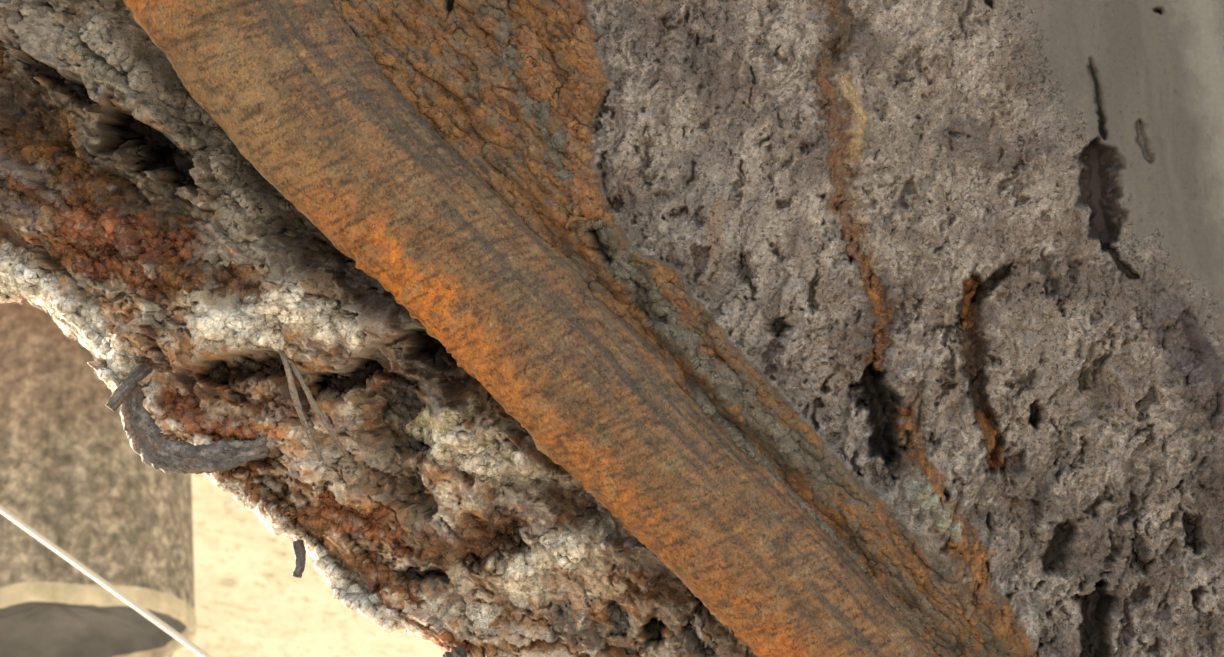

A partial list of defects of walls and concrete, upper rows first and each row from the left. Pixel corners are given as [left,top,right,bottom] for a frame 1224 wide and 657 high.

corrosion [0,108,300,319]
crack [1078,60,1152,278]
corrosion [161,389,256,442]
spalling [0,0,759,657]
corrosion [332,0,1037,657]
spalling [577,0,1224,657]
crack [957,265,1011,471]
corrosion [212,447,523,654]